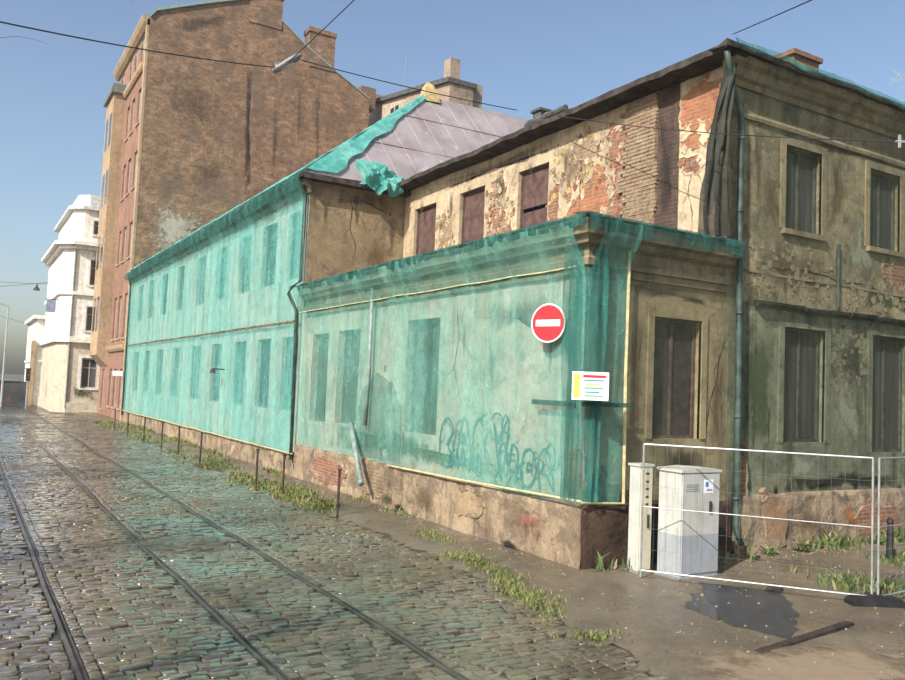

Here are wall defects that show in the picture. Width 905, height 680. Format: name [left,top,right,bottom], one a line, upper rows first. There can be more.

spalling [435,210,455,249]
peeling [485,169,516,237]
peeling [545,120,629,222]
spalling [677,71,722,176]
spalling [312,453,348,487]
flaking render [356,366,404,504]